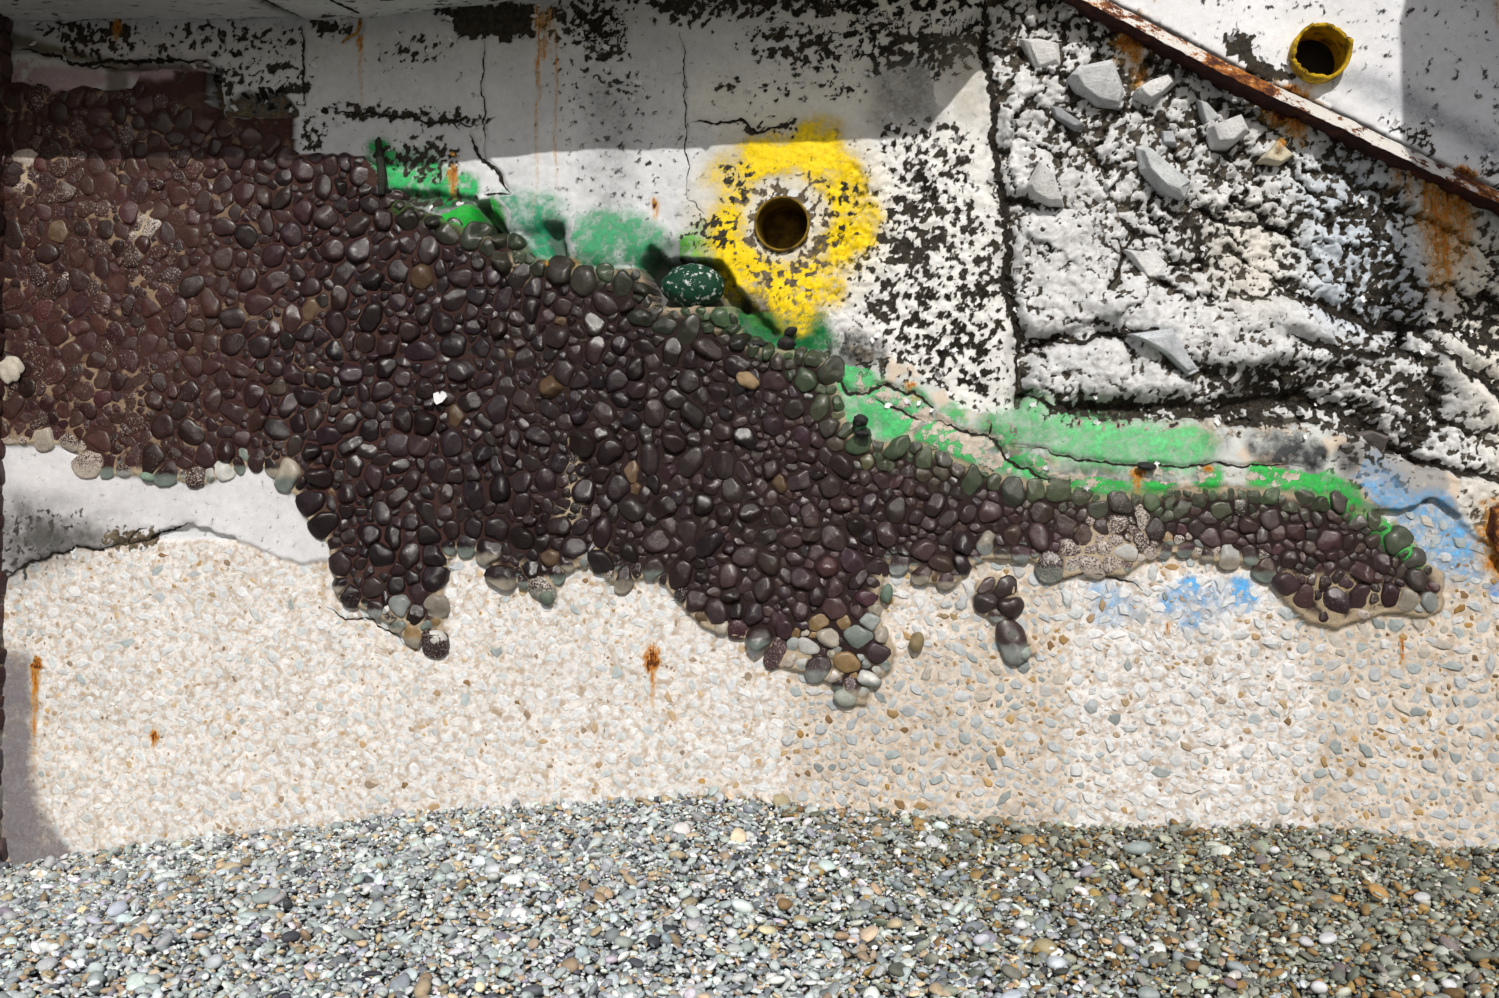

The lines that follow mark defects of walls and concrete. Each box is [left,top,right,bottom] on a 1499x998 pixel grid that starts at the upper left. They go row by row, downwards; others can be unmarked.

crack [265,0,511,195]
crack [679,33,793,213]
corrosion [1115,13,1146,88]
corrosion [1261,83,1321,153]
crack [840,0,1499,484]
corrosion [1392,165,1478,289]
crack [7,522,194,578]
corrosion [1475,499,1499,577]
corrosion [29,657,42,753]
corrosion [643,645,660,696]